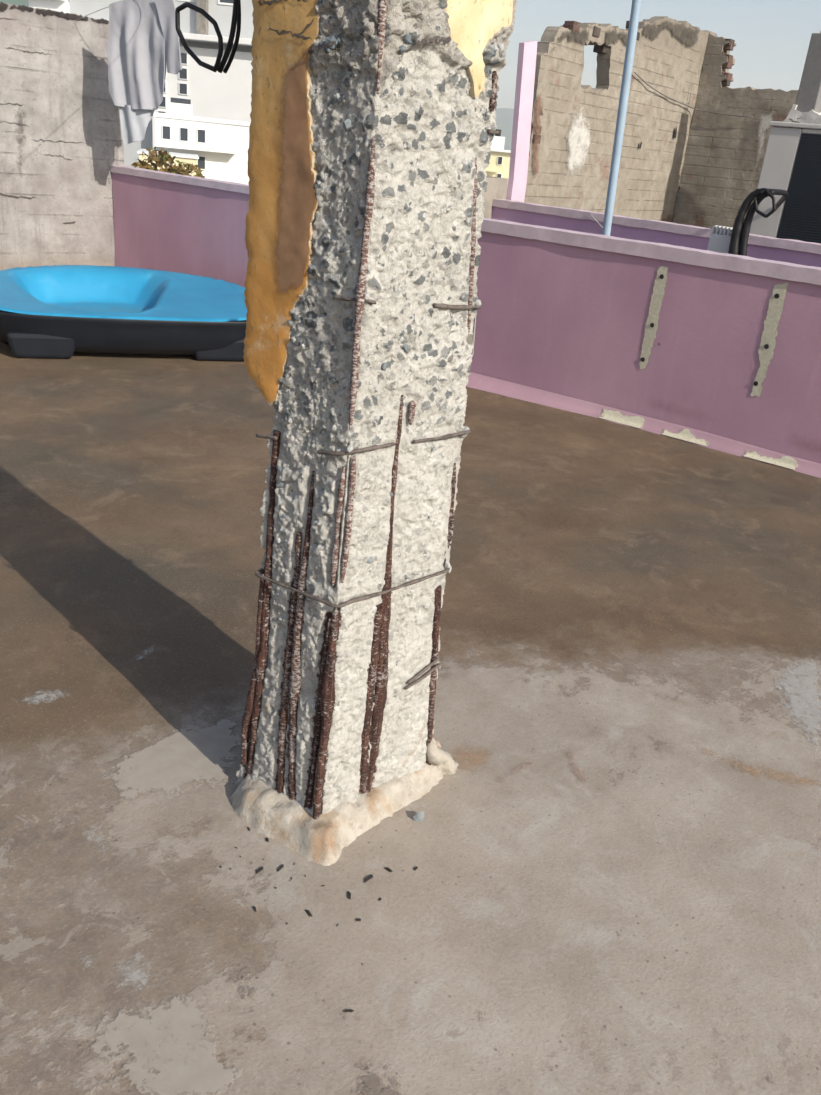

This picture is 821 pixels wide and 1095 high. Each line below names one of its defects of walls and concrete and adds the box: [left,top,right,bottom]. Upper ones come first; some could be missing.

crack [258,0,345,53]
crack [400,35,451,46]
spalling [563,21,608,54]
spalling [721,39,735,87]
crack [0,103,86,160]
leakage [568,113,590,173]
crack [0,192,39,200]
peeling [750,282,788,397]
spalling [103,0,517,816]
peeling [599,409,646,429]
peeling [663,429,709,446]
peeling [743,449,798,470]